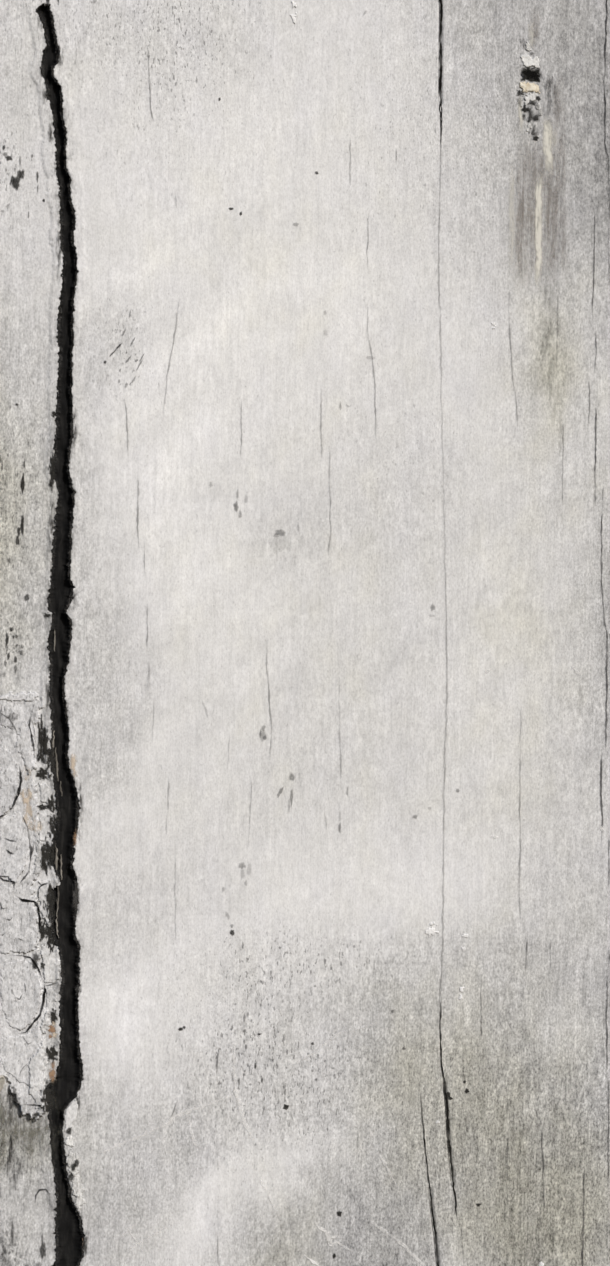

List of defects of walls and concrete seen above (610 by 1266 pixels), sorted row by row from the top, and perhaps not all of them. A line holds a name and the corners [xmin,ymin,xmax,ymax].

crack [437,0,445,144]
crack [35,0,87,1266]
peeling [0,691,61,1120]
crack [421,1008,457,1266]